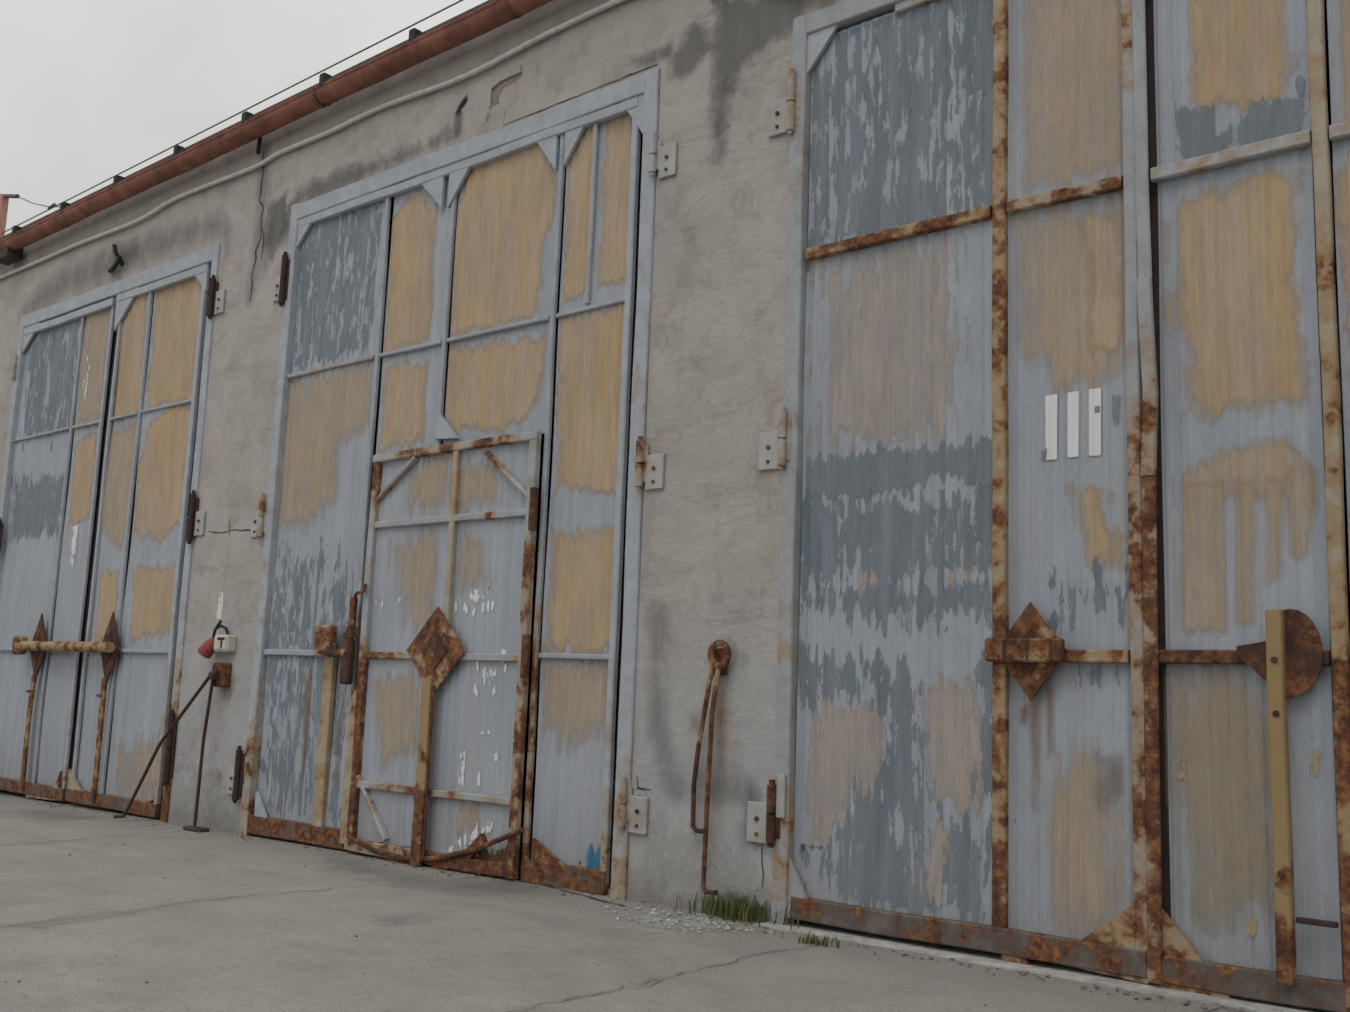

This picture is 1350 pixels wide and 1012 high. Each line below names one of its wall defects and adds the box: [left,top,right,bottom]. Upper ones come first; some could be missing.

peeling [6,278,202,557]
crack [250,150,264,299]
peeling [280,192,437,523]
peeling [445,114,632,494]
damp [645,0,803,138]
peeling [806,0,993,273]
peeling [95,564,176,642]
peeling [455,600,495,616]
peeling [797,435,992,923]
corrosion [475,844,508,863]